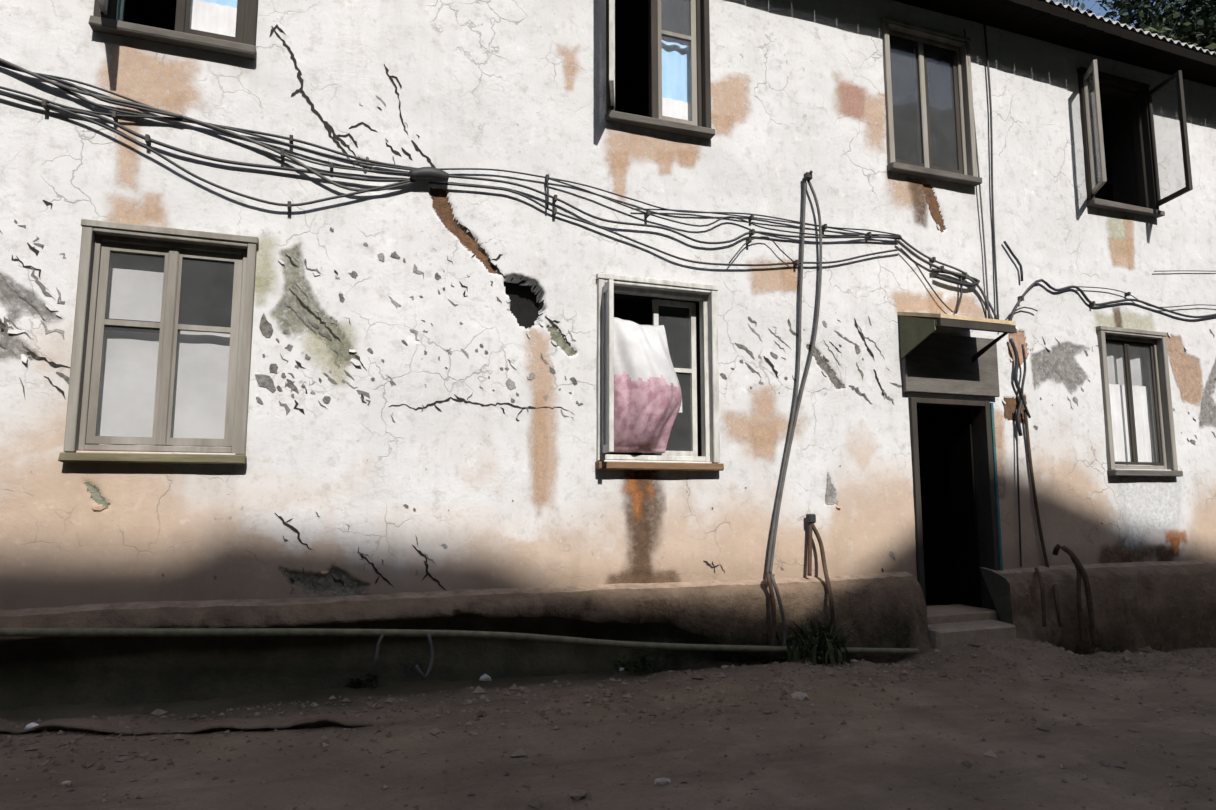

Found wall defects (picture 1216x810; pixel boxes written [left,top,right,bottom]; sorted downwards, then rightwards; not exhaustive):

crack [269,25,436,168]
corrosion [892,179,927,226]
spalling [0,220,70,400]
spalling [255,246,396,415]
spalling [363,242,469,306]
crack [389,393,572,417]
spalling [429,181,577,356]
spalling [1002,327,1099,430]
spalling [1166,332,1216,445]
corrosion [627,476,652,518]
water stain [609,470,678,584]
corrosion [1166,532,1186,556]